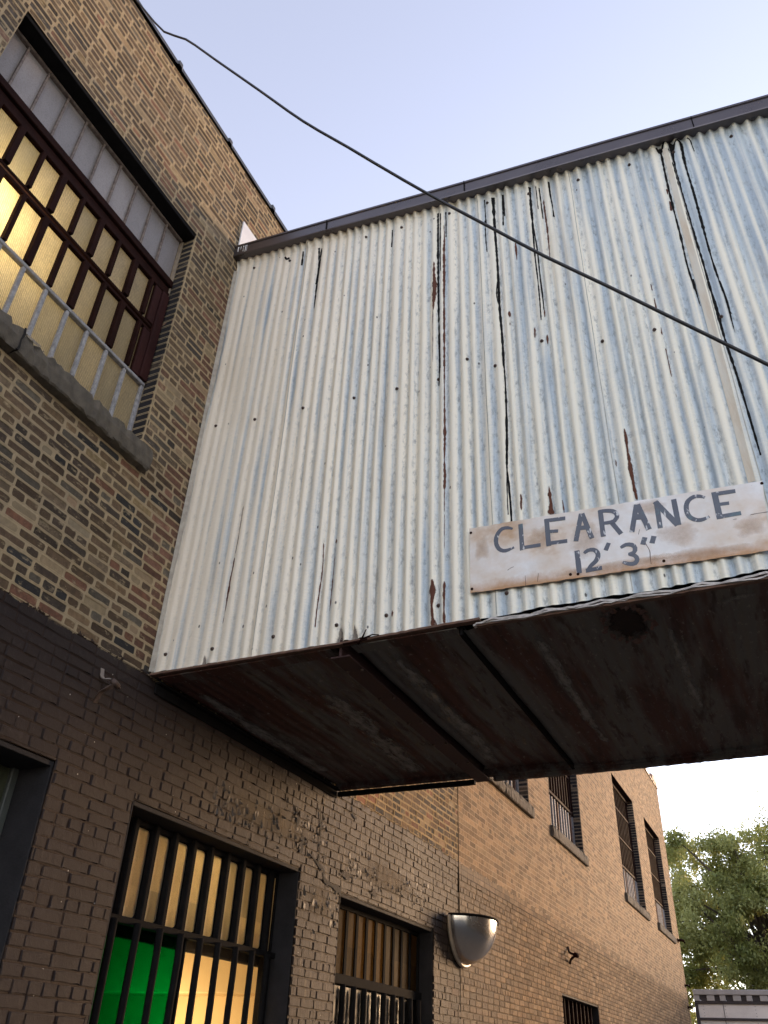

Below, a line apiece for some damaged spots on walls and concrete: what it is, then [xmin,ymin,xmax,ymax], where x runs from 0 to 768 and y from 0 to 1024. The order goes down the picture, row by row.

corrosion [432,227,447,548]
corrosion [547,487,565,515]
corrosion [615,429,638,500]
corrosion [149,576,768,678]
peeling [213,781,328,856]
peeling [340,847,429,911]